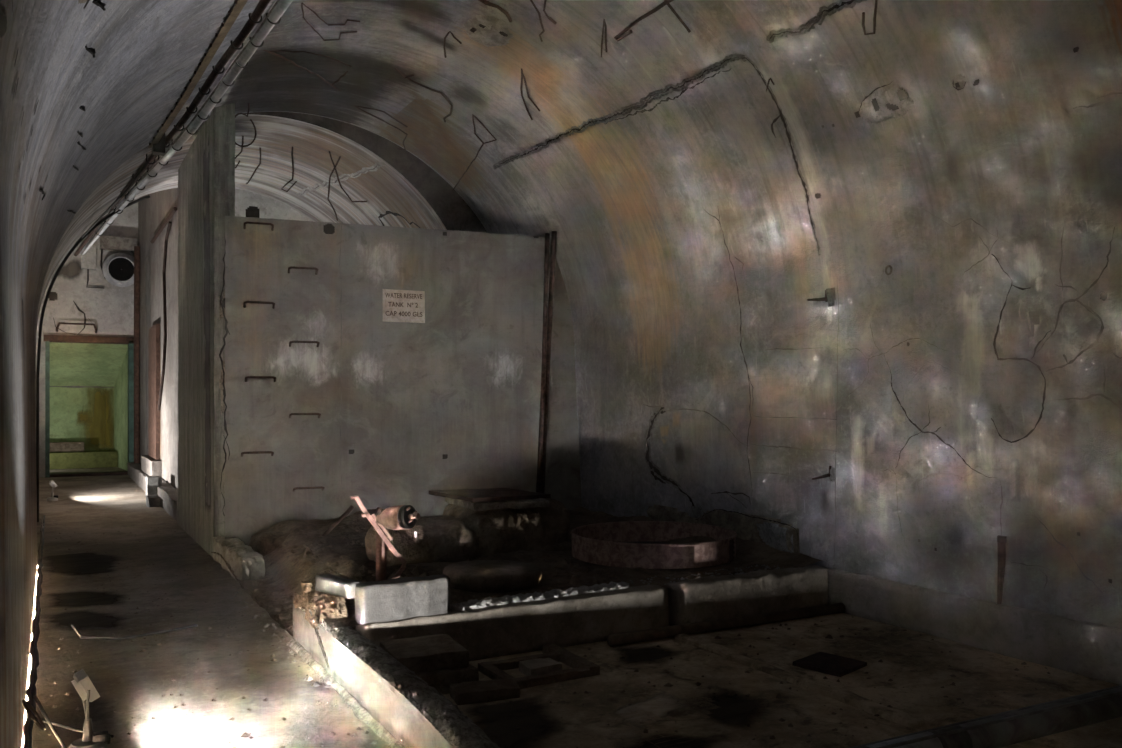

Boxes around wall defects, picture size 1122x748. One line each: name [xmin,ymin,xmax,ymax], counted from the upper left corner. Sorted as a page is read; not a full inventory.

crack [493,0,867,256]
spalling [854,81,915,124]
crack [219,240,230,516]
crack [643,211,1003,551]
crack [965,227,1122,443]